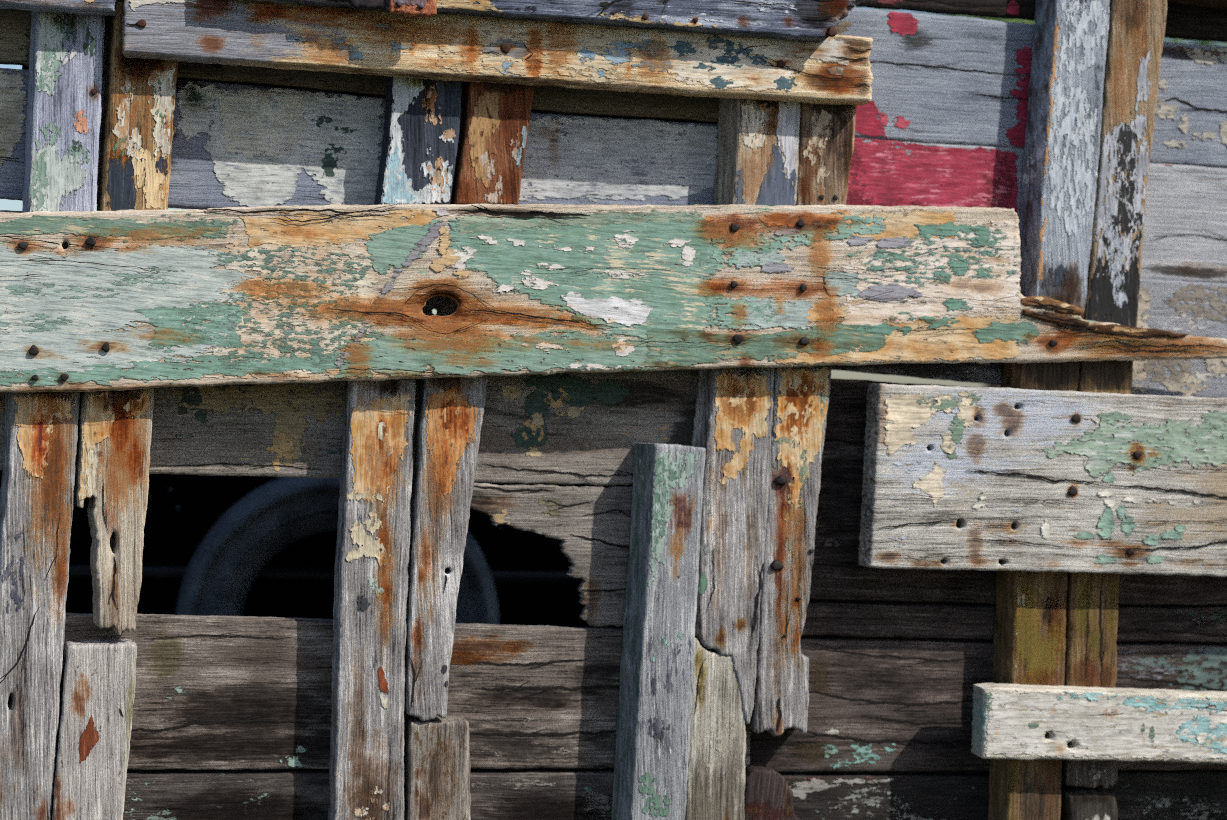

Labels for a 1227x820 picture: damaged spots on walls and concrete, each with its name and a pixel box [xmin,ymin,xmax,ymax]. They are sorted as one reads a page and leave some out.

corrosion [240,281,540,364]
peeling [0,0,1227,615]
corrosion [701,280,763,295]
corrosion [770,214,837,263]
crack [776,243,1227,354]
corrosion [719,376,755,417]
corrosion [786,376,819,432]
corrosion [33,401,72,556]
corrosion [773,466,803,638]
crack [815,462,1227,574]
crack [1084,580,1227,711]
peeling [985,647,1227,783]